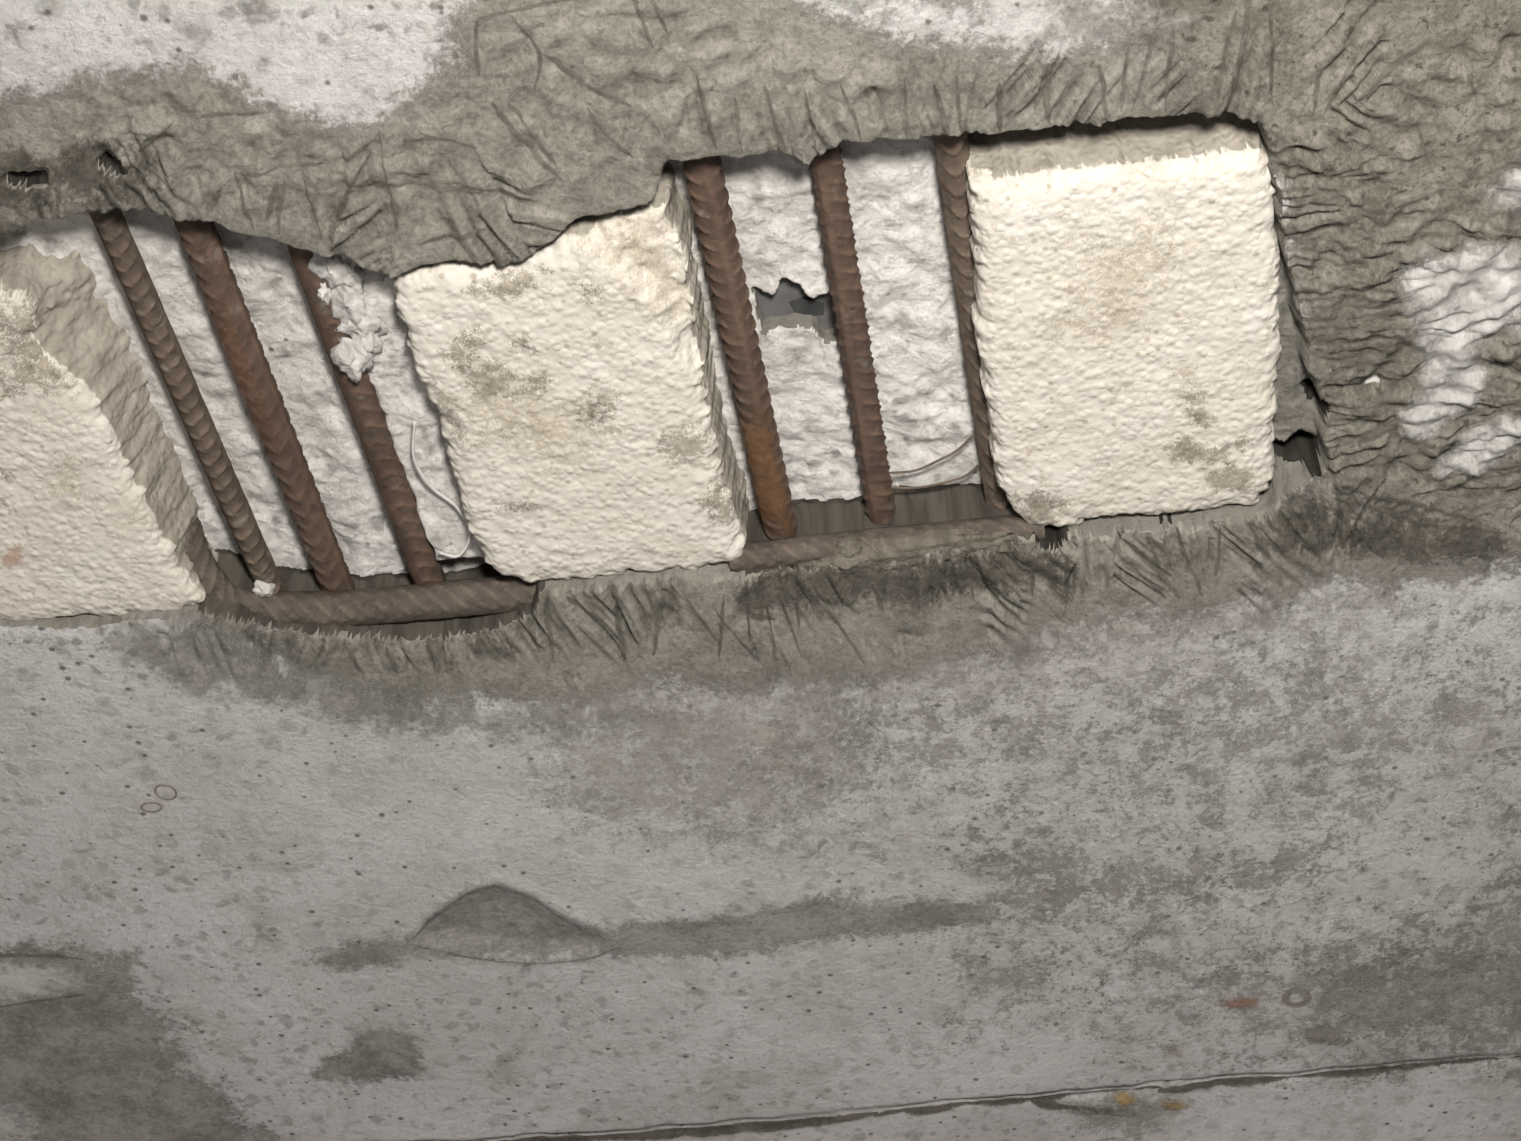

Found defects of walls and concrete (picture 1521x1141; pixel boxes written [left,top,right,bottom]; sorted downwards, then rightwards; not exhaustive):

peeling [0,0,1521,714]
rust [739,413,790,532]
leakage [306,942,408,971]
leakage [0,931,282,1141]
leakage [310,1029,425,1084]
crack [500,1055,1521,1141]